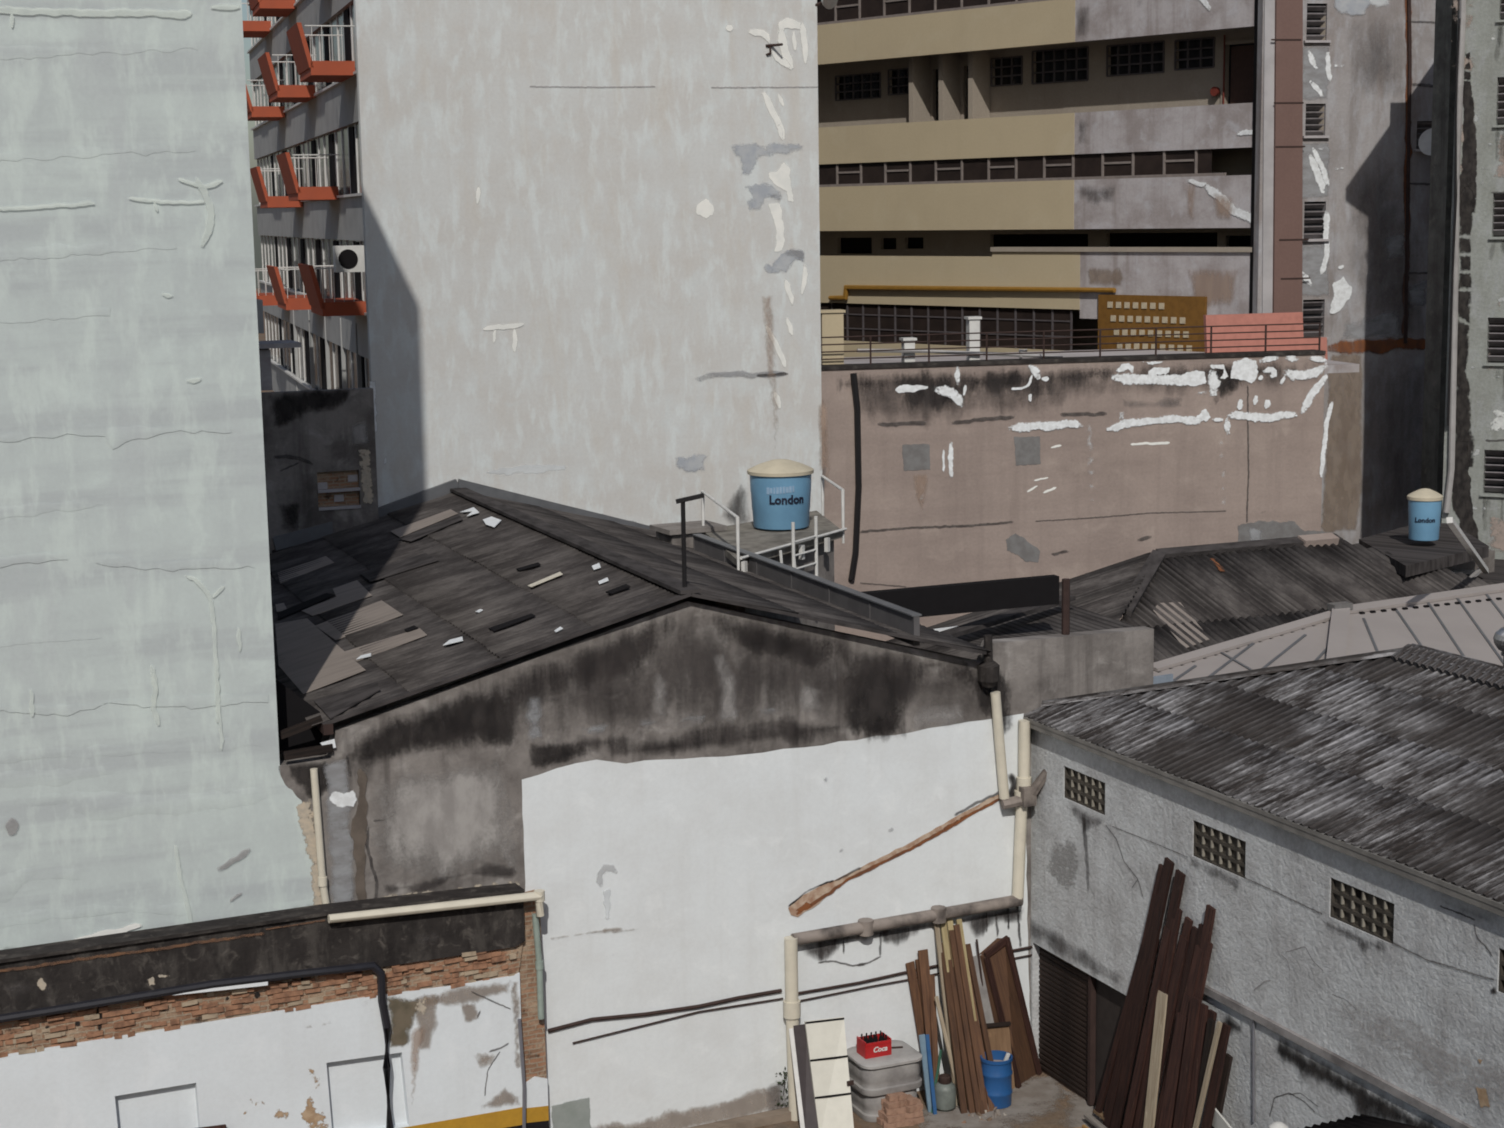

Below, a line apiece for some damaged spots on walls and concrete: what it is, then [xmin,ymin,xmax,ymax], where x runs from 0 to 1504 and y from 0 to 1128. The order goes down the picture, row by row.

peeling [1490,409,1504,431]
damp [359,618,830,768]
damp [847,655,961,734]
damp [956,668,1010,730]
crack [1106,825,1187,896]
crack [1244,877,1356,1009]
crack [1391,906,1494,980]
peeling [387,998,427,1070]
peeling [463,1005,477,1021]
damp [1278,1042,1435,1128]